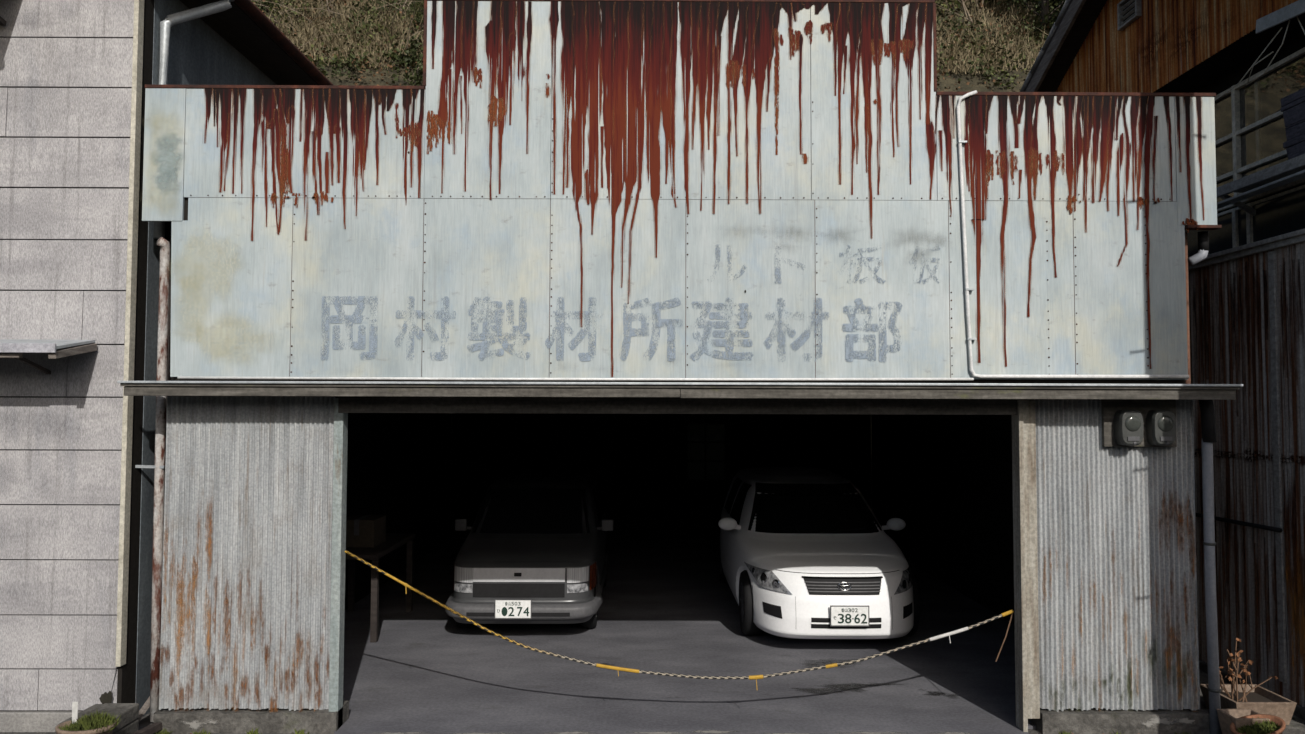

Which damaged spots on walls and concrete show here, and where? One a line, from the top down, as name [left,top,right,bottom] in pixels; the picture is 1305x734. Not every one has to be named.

rust [204,0,532,241]
rust [546,1,1204,377]
rust [161,506,329,712]
rust [1156,445,1305,700]